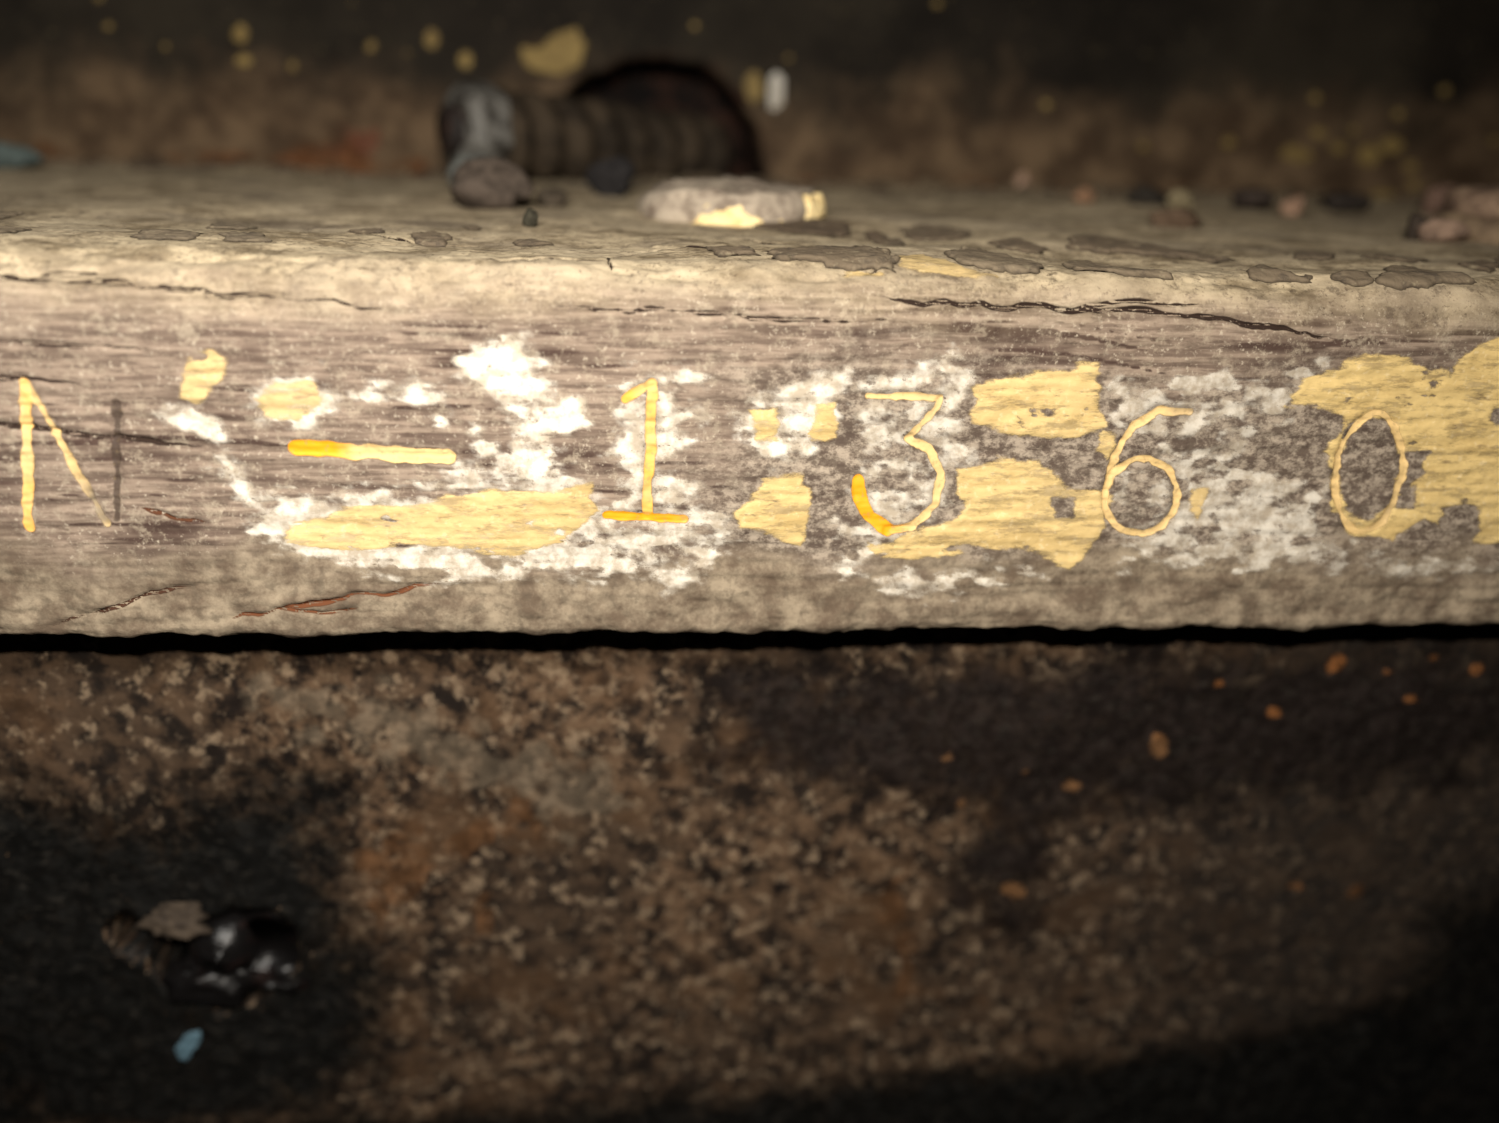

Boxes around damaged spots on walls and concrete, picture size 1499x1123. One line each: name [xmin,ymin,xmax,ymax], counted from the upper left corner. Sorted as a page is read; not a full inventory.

crack [0,271,381,310]
crack [571,270,1326,339]
rust [1328,655,1345,673]
rust [1267,707,1280,717]
rust [1151,734,1168,757]